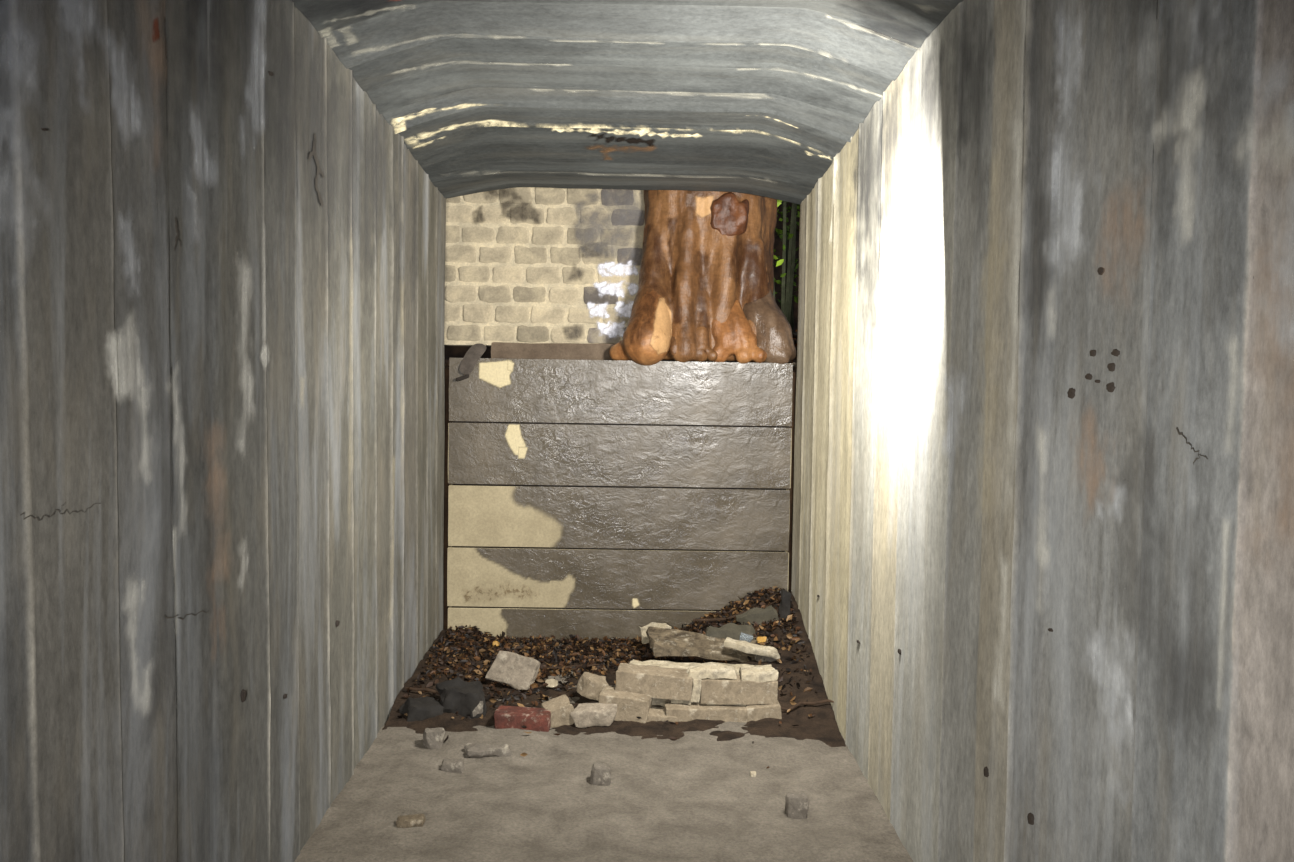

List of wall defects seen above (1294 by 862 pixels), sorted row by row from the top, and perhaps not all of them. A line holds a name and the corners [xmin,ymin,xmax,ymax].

spalling [393,104,522,148]
spalling [548,126,700,147]
peeling [479,360,514,387]
peeling [505,425,527,458]
crack [1176,427,1207,465]
crack [20,503,101,521]